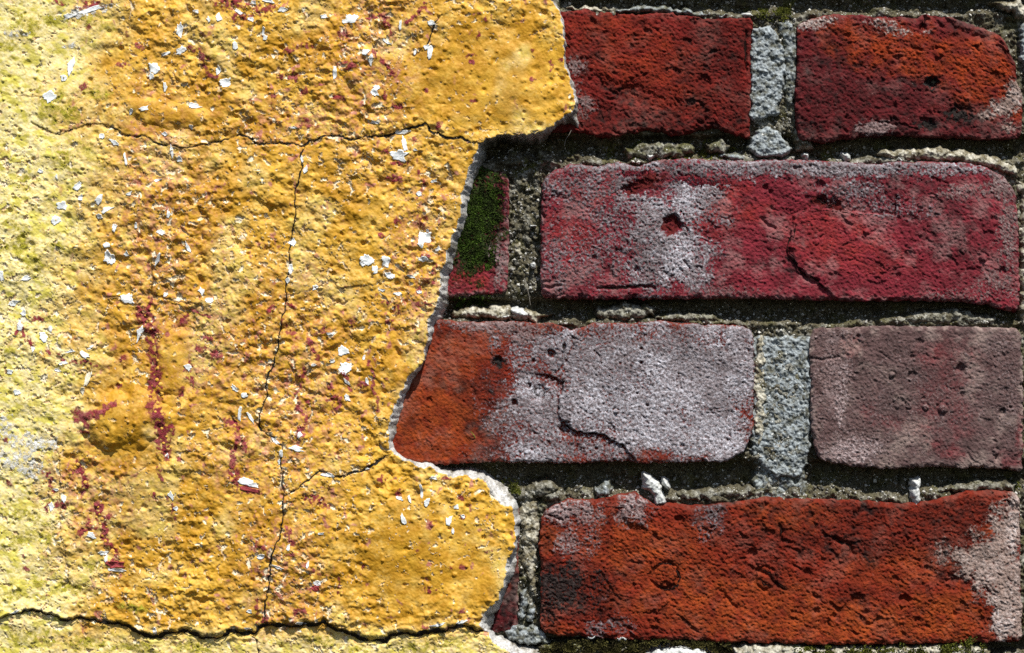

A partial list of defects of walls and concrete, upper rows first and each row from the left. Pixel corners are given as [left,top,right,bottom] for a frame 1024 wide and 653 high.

spalling [923,76,940,92]
spalling [623,169,666,196]
spalling [809,190,844,213]
spalling [661,212,683,237]
peeling [360,254,415,296]
damp [488,228,508,290]
spalling [388,0,579,653]
crack [0,122,486,653]
peeling [641,471,671,505]